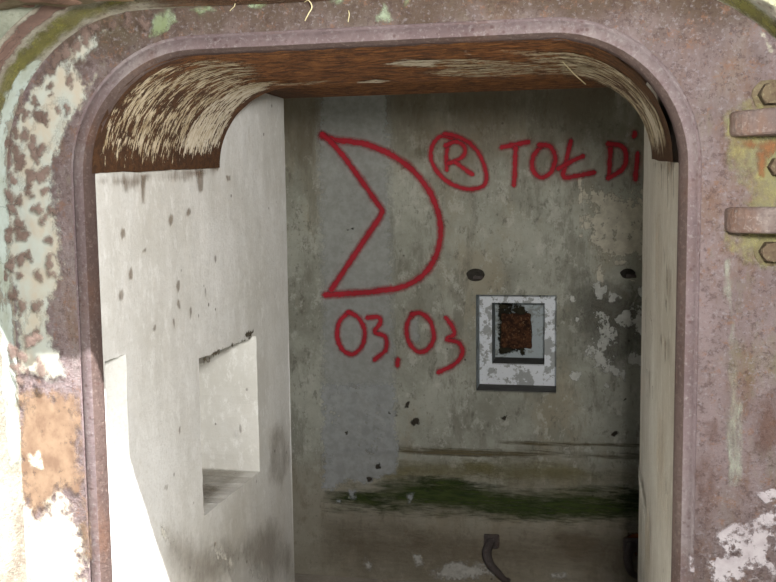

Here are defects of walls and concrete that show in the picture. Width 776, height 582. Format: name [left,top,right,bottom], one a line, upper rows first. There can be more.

rust [7,329,85,511]
peeling [0,36,97,464]
peeling [578,178,643,302]
peeling [585,278,642,381]